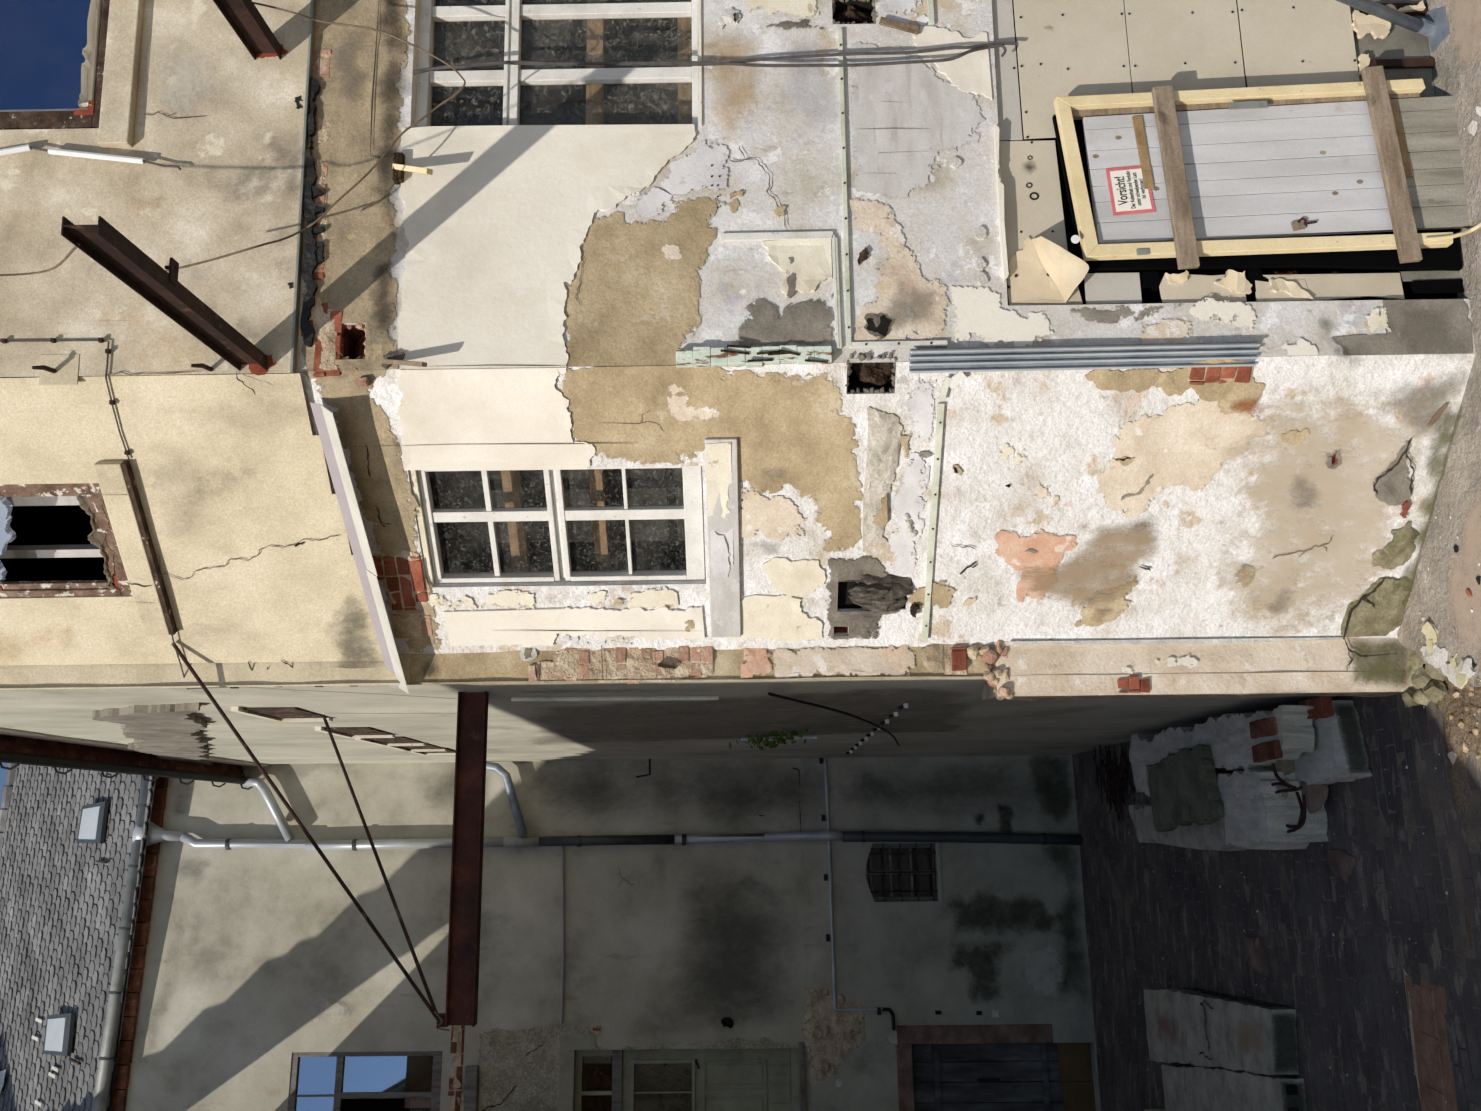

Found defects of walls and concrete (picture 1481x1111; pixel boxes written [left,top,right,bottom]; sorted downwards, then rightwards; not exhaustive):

peeling [301,0,1053,700]
peeling [1070,298,1258,344]
peeling [1281,338,1318,355]
flaking render [1085,359,1310,519]
spalling [1325,449,1343,469]
crack [126,535,340,603]
flaking render [994,529,1078,605]
flaking render [1074,566,1151,627]
peeling [1234,565,1263,587]
flaking render [1340,441,1419,638]
water stain [951,895,1052,1000]
flaking render [798,988,866,1081]